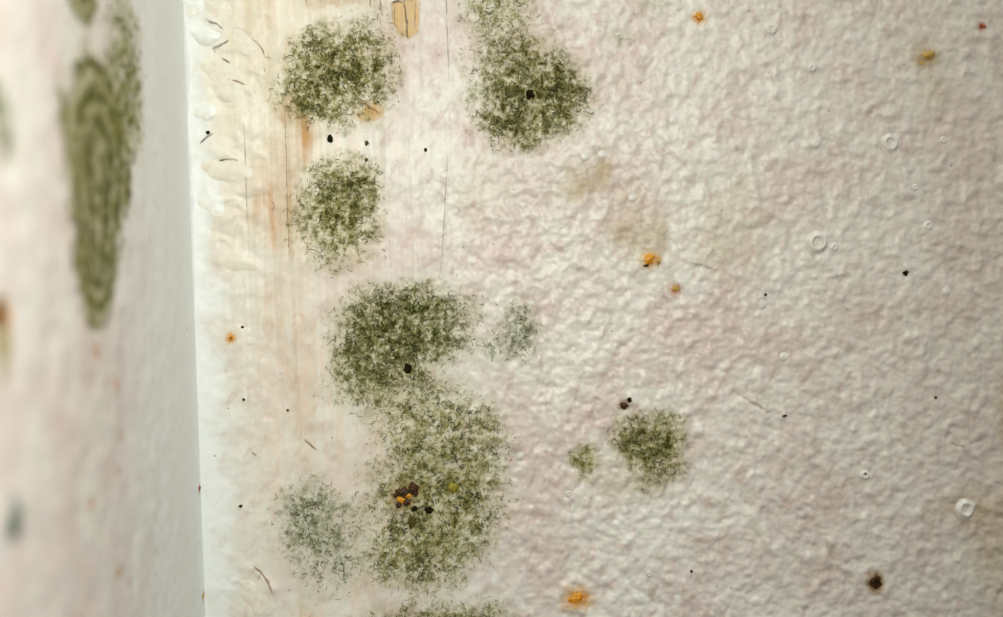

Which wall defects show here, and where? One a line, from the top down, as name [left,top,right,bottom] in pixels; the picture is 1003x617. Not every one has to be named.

peeling [359,0,419,37]
leakage [455,0,597,156]
leakage [60,0,147,330]
leakage [268,5,542,617]
leakage [568,407,695,497]